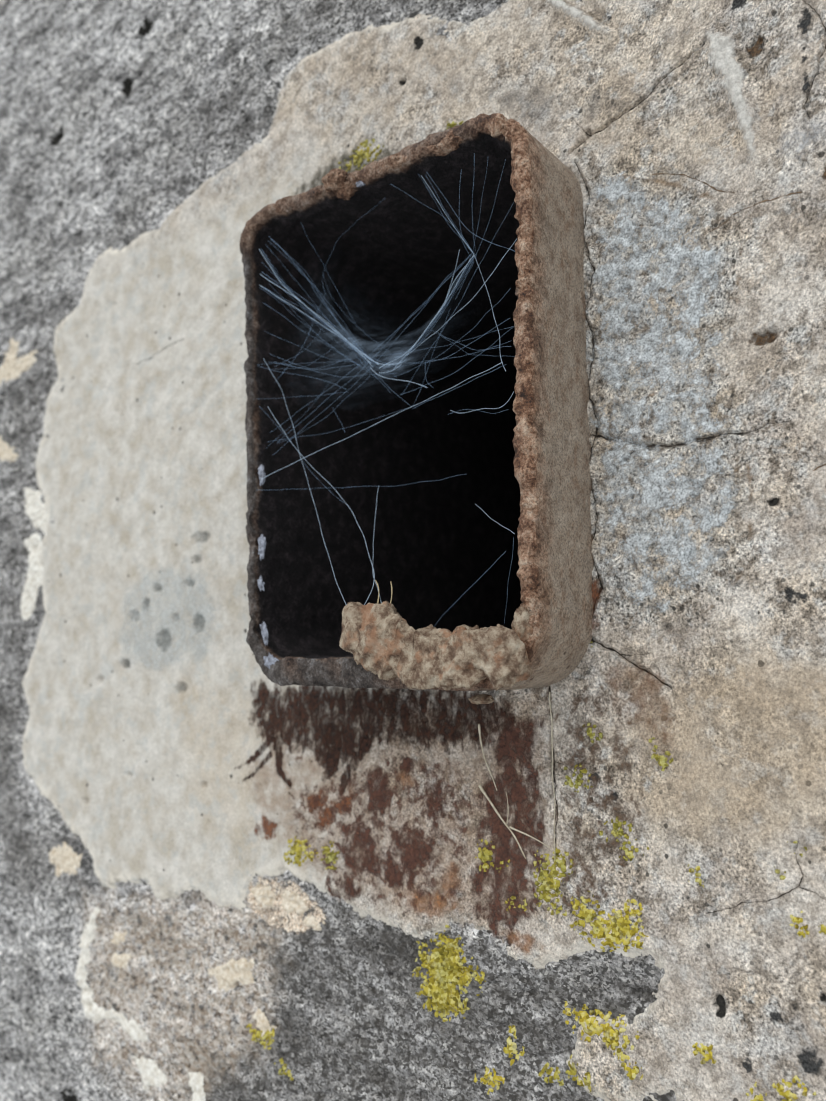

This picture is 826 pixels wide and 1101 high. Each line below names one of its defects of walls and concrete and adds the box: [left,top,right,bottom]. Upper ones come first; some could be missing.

crack [572,43,802,464]
rust [591,581,600,628]
crack [592,490,603,611]
crack [591,638,671,688]
rust [238,682,545,951]
rust [555,669,661,915]